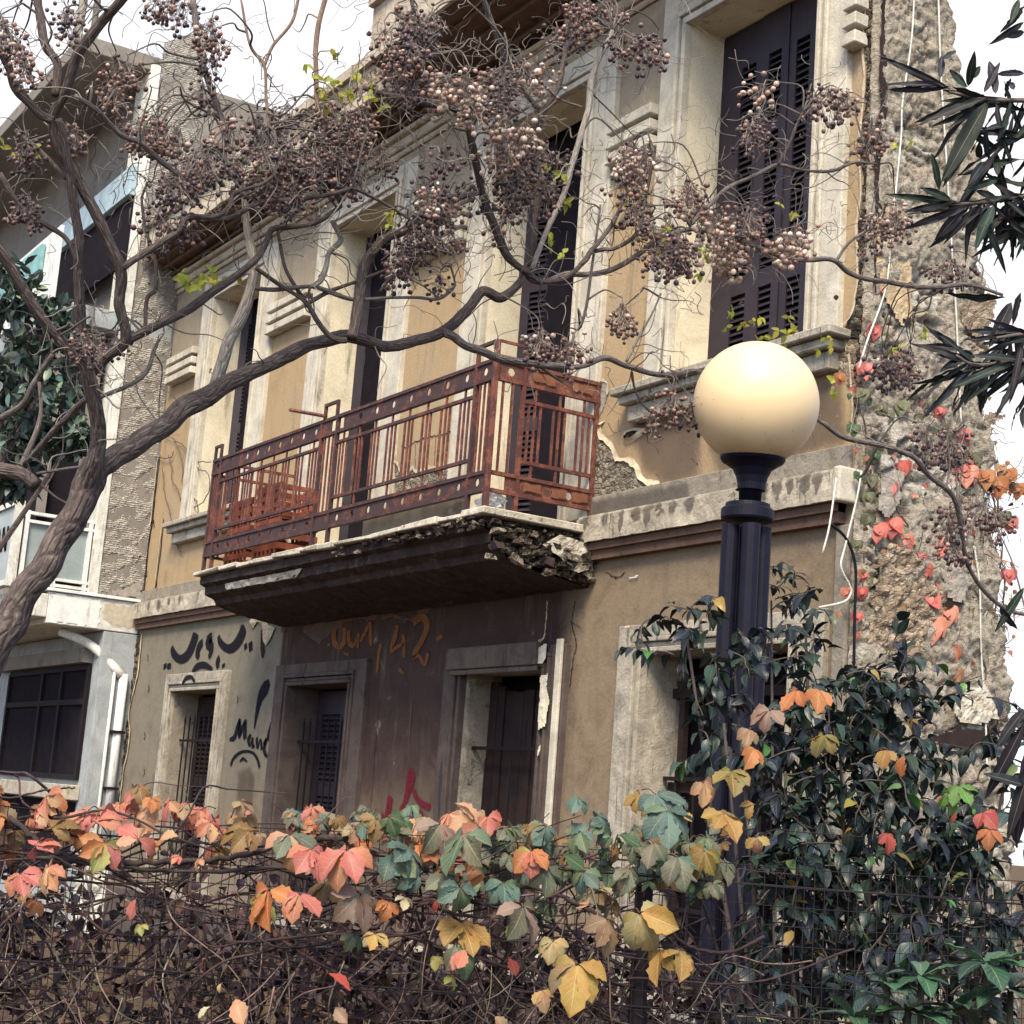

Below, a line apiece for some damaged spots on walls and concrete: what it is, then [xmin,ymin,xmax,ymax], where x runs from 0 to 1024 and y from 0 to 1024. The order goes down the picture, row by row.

spalling [838,0,873,425]
spalling [960,293,997,337]
rust [533,373,557,387]
rust [573,382,594,396]
spalling [593,378,660,497]
spalling [983,412,1006,427]
rust [523,482,588,503]
water stain [762,472,822,500]
spalling [331,516,598,584]
crack [538,602,581,687]
peeling [538,644,549,730]